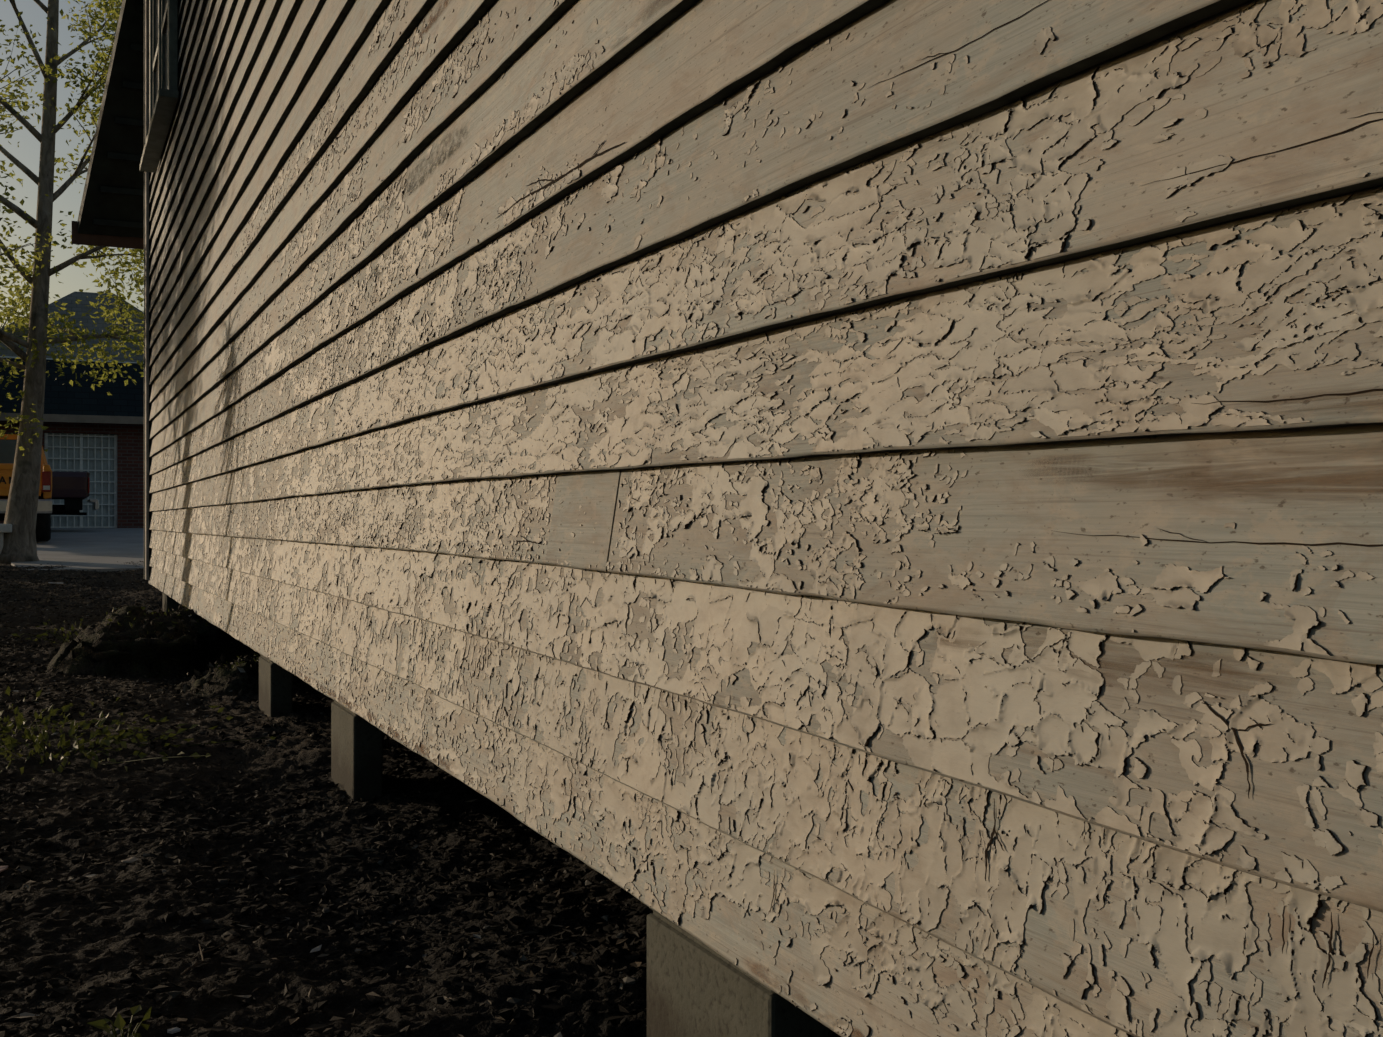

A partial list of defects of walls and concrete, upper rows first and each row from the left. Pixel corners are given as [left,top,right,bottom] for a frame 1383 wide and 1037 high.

peeling [223,9,438,294]
peeling [367,0,408,58]
peeling [397,7,530,147]
peeling [433,40,605,199]
peeling [496,154,581,230]
peeling [597,160,626,203]
peeling [716,65,823,167]
peeling [1160,155,1233,199]
peeling [1203,0,1383,79]
peeling [274,166,410,324]
peeling [991,542,1230,616]
peeling [1212,545,1383,717]